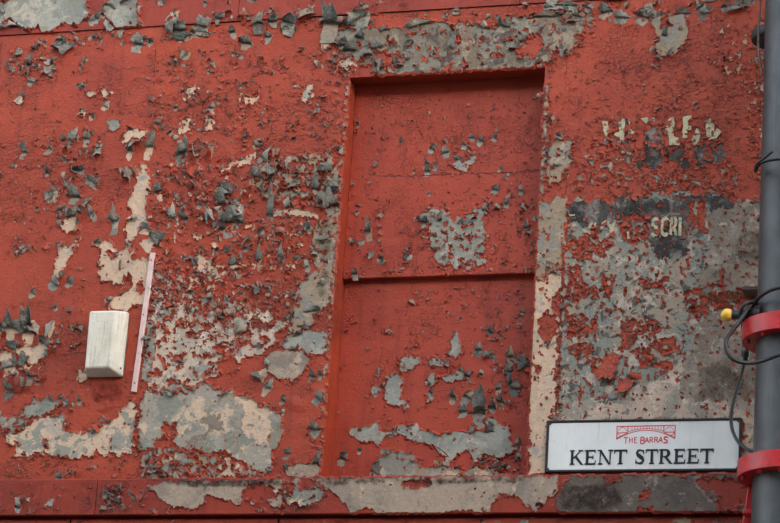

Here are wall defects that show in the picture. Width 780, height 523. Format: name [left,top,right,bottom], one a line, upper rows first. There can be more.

peeling [0,0,155,116]
peeling [77,105,95,121]
peeling [0,205,52,260]